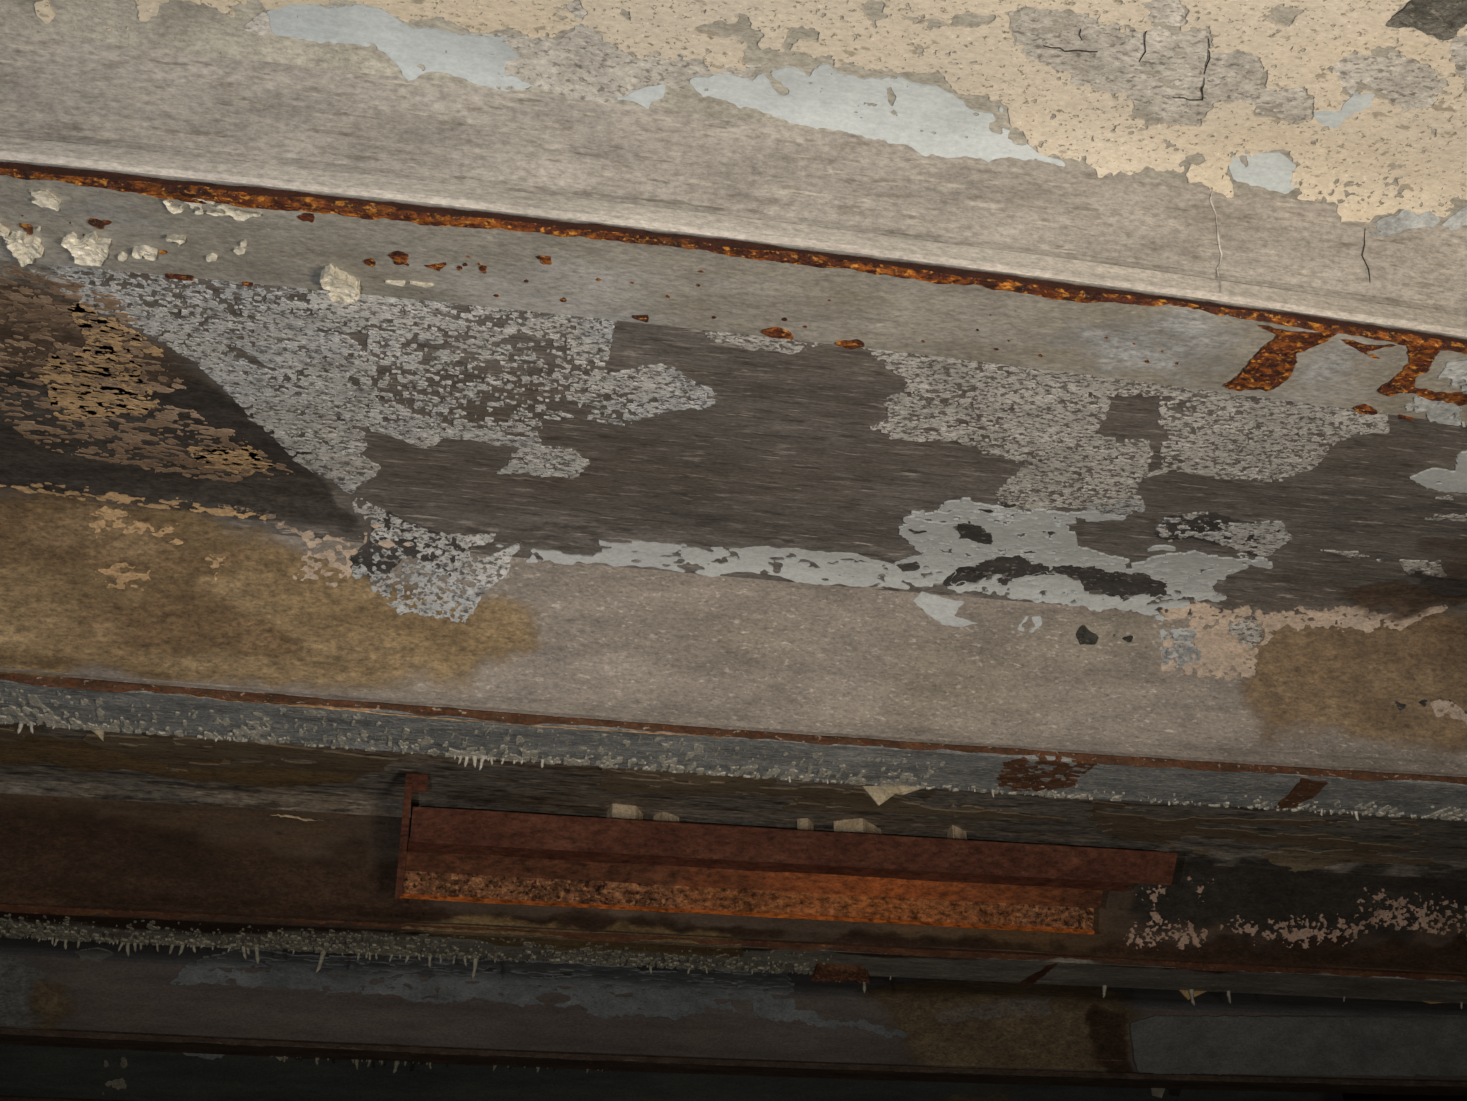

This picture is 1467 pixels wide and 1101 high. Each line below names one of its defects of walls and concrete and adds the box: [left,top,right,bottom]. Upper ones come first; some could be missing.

peeling [107,0,1467,236]
water stain [0,260,203,398]
peeling [0,223,1448,681]
rust [0,162,1467,415]
peeling [1405,359,1467,427]
peeling [1410,451,1467,522]
water stain [0,484,1125,801]
rust [0,672,1467,809]
water stain [1247,614,1467,748]
rust [1347,583,1467,620]
rust [0,811,1467,984]
water stain [1124,855,1467,951]